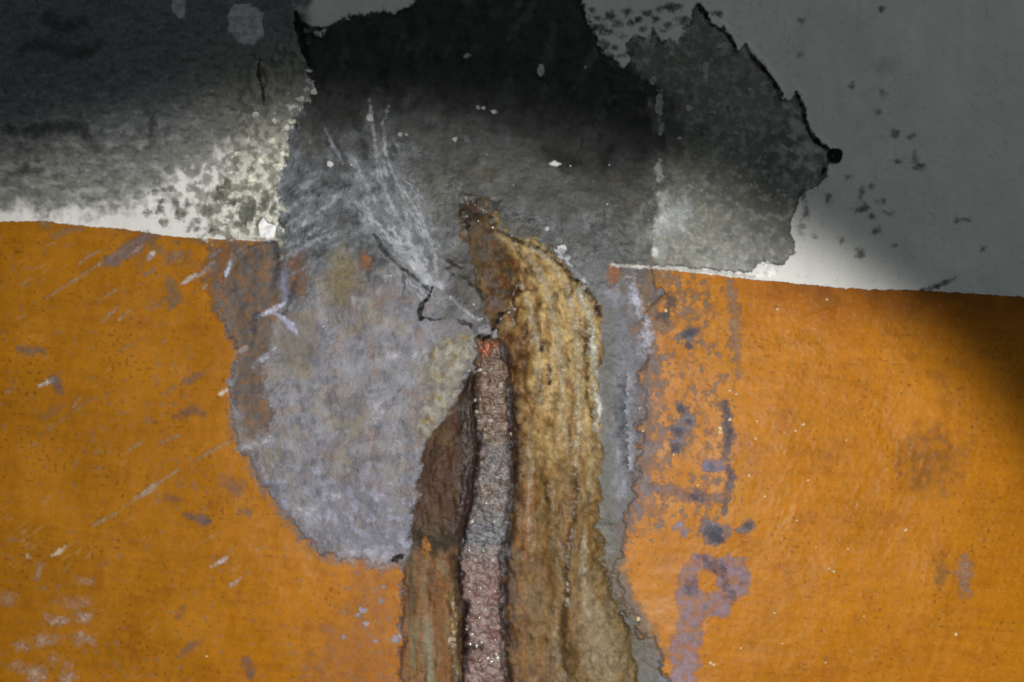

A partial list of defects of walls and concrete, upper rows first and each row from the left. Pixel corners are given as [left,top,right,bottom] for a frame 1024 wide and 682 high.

damp [0,0,692,682]
crack [417,287,439,321]
corrosion [391,369,478,682]
spalling [199,0,833,682]